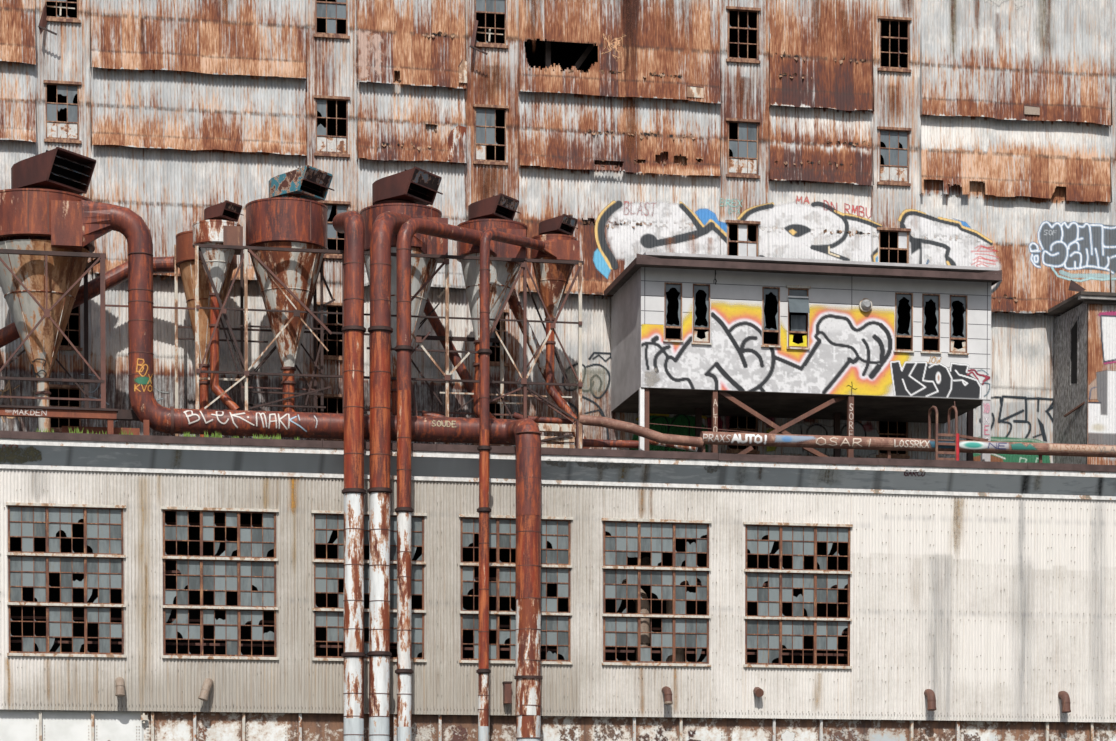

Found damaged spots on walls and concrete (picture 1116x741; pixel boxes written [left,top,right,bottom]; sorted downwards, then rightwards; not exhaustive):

rust [622,0,637,64]
peeling [411,725,435,741]
peeling [451,725,468,741]
peeling [556,725,579,741]
peeling [593,722,668,741]
peeling [781,730,795,741]
peeling [825,726,857,741]
peeling [916,730,980,741]